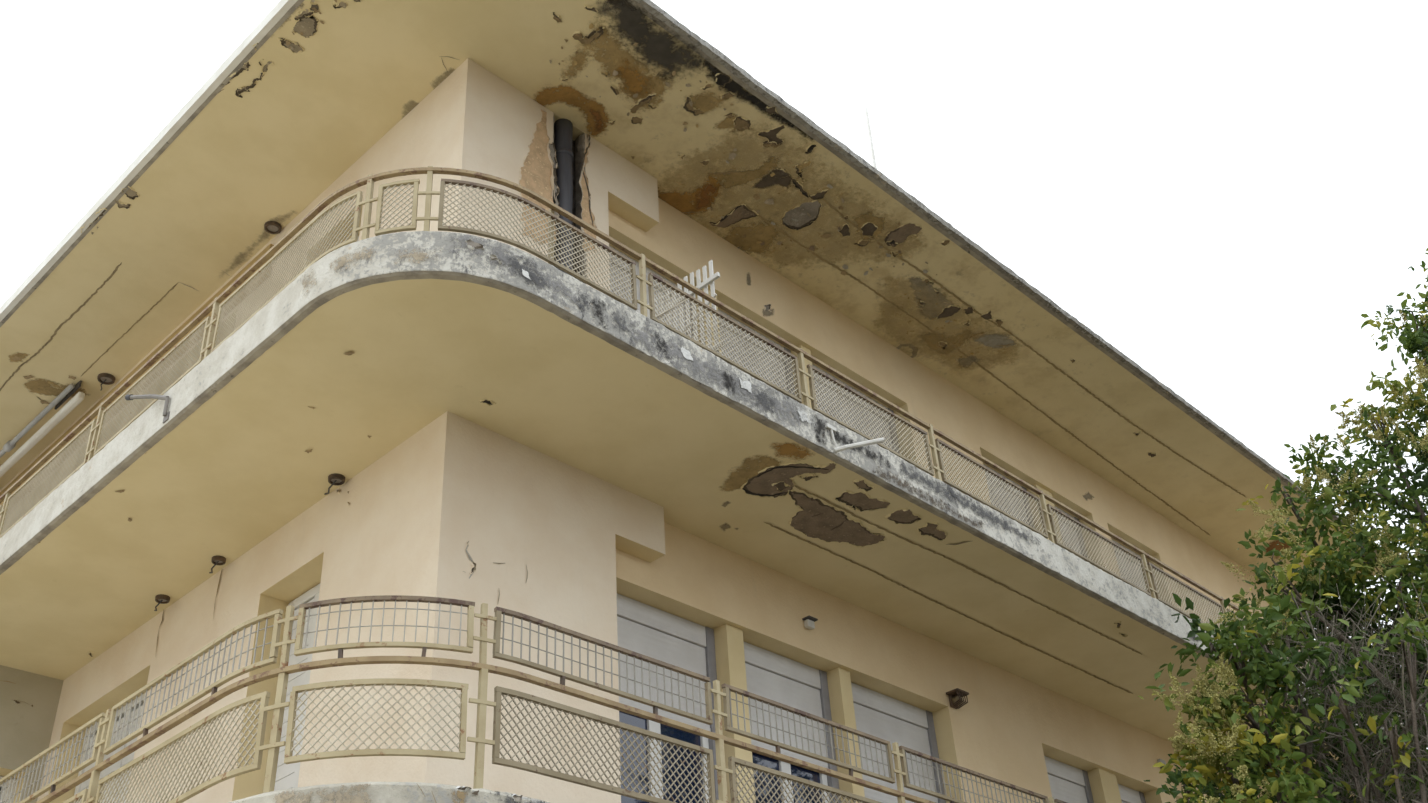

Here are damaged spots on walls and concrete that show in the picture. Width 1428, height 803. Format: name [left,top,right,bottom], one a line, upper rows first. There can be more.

peeling [278,0,361,53]
peeling [222,43,274,98]
damp [549,0,813,140]
peeling [682,83,785,148]
spalling [781,160,829,230]
peeling [838,213,922,257]
damp [509,257,549,287]
crack [0,262,122,391]
damp [576,290,628,330]
damp [897,310,1015,367]
peeling [909,278,1004,327]
spalling [740,462,971,547]